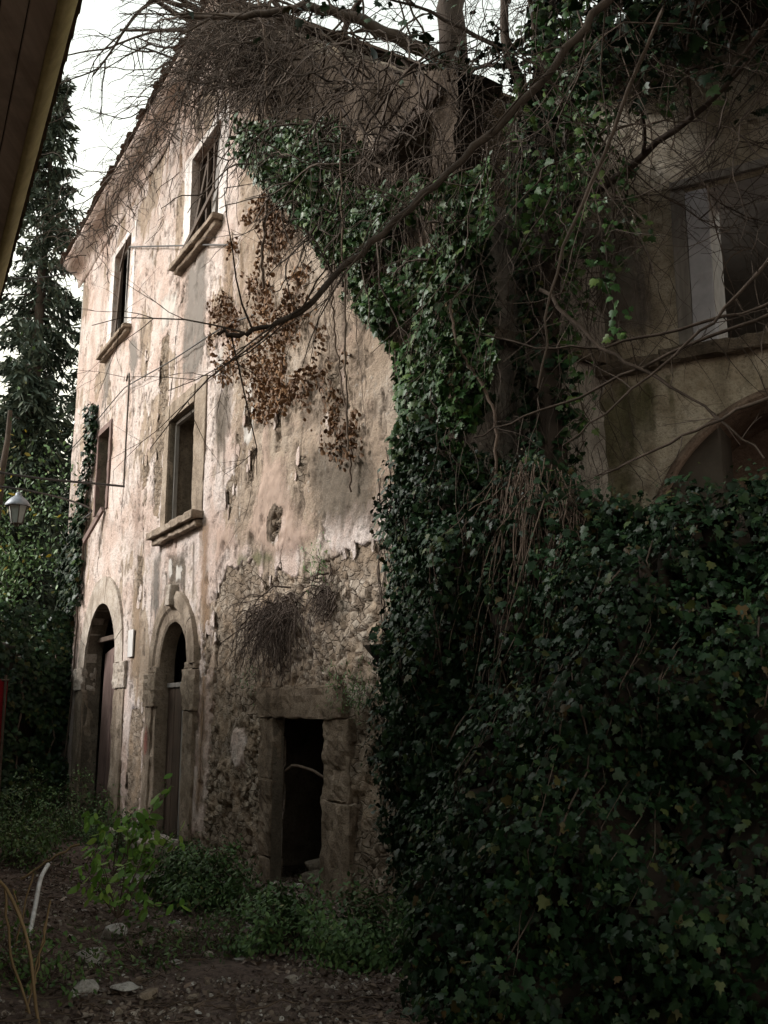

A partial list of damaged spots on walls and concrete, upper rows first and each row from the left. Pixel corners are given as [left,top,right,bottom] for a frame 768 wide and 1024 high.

spalling [271,506,286,547]
spalling [203,539,407,921]